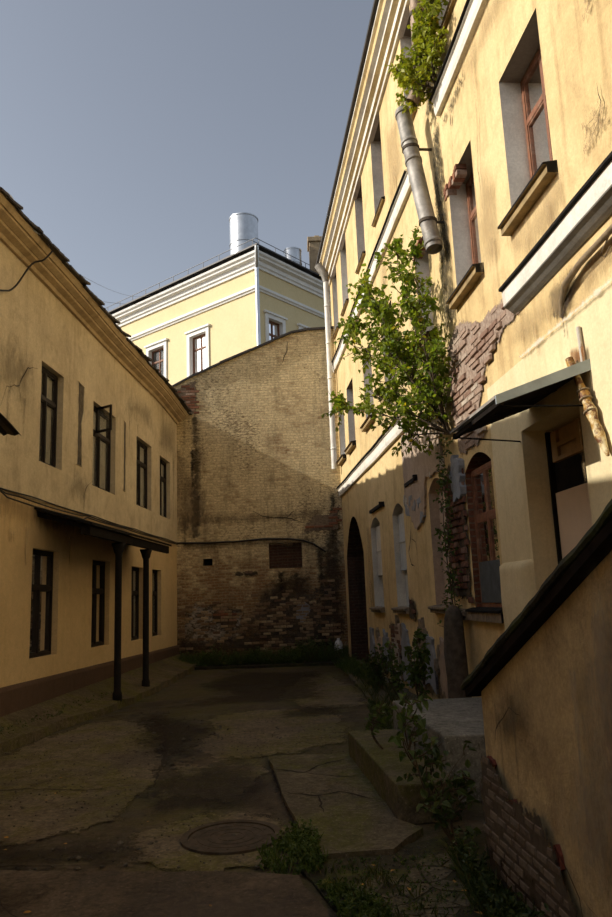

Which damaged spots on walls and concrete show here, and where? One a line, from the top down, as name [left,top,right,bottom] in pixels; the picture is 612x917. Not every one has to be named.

flaking render [176,379,199,414]
flaking render [401,299,519,603]
crack [271,758,381,824]
flaking render [478,744,577,917]